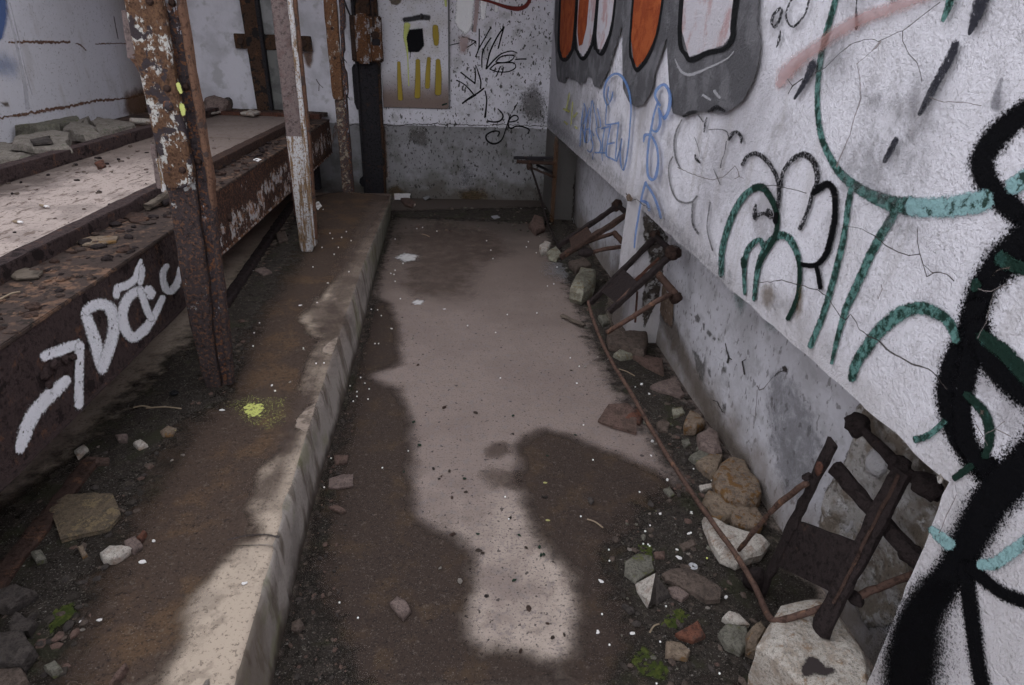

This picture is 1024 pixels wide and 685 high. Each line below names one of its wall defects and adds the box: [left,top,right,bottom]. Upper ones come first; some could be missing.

rust [0,89,147,119]
crack [787,2,981,168]
rust [0,138,155,210]
crack [677,166,838,197]
rust [0,198,171,334]
flaking render [635,213,674,328]
crack [760,279,947,389]
crack [847,226,954,282]
crack [977,284,1012,339]
flaking render [819,478,866,540]
flaking render [843,403,949,550]
flaking render [854,536,914,629]